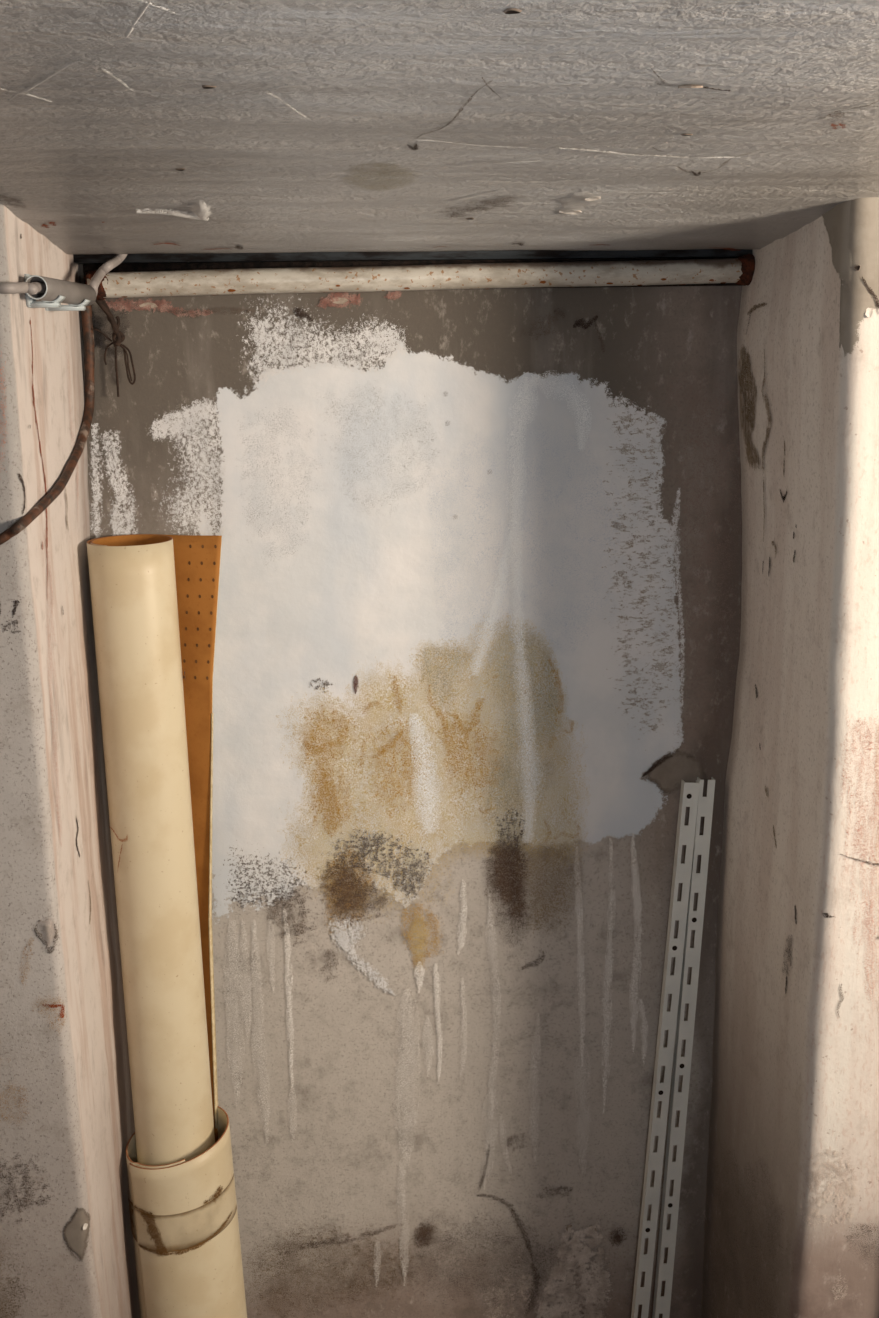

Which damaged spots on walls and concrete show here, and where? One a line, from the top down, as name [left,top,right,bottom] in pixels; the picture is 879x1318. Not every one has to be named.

peeling [822,197,879,357]
water stain [266,615,591,992]
spalling [642,750,707,794]
water stain [243,1166,566,1318]